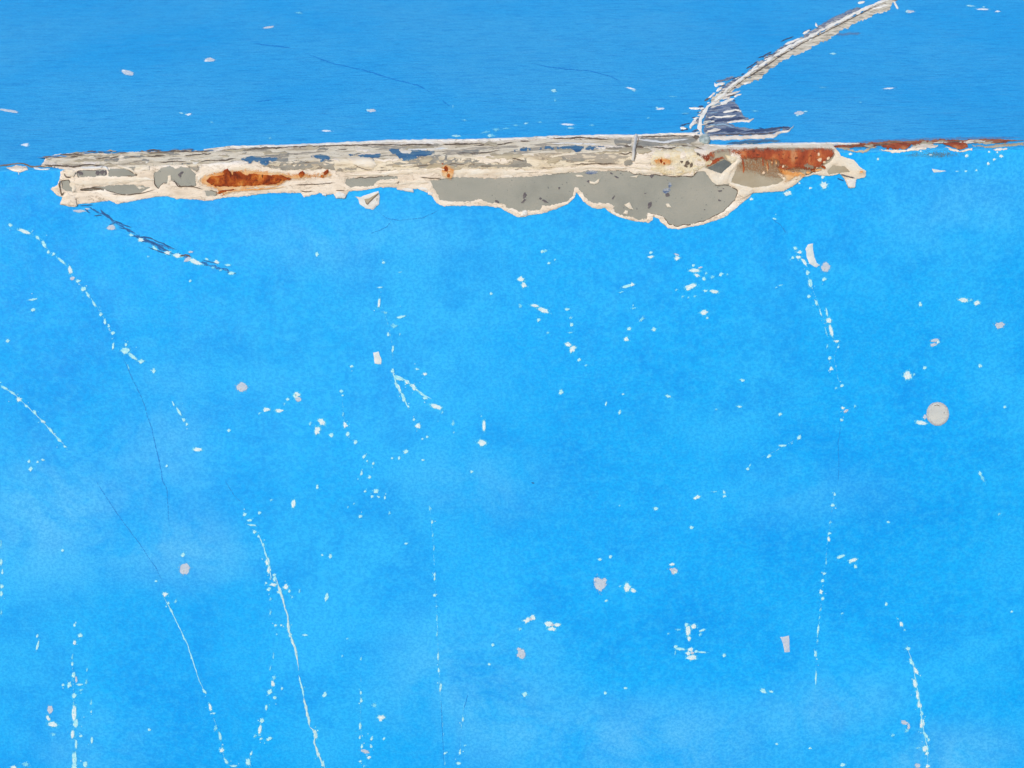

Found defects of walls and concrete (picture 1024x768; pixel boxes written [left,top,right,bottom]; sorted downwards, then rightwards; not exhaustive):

corrosion [197,169,334,195]
peeling [0,0,916,229]
corrosion [702,136,1024,182]
peeling [8,223,156,375]
peeling [791,244,841,371]
peeling [0,385,67,448]
peeling [914,402,949,426]
peeling [243,512,300,639]
peeling [890,646,931,768]